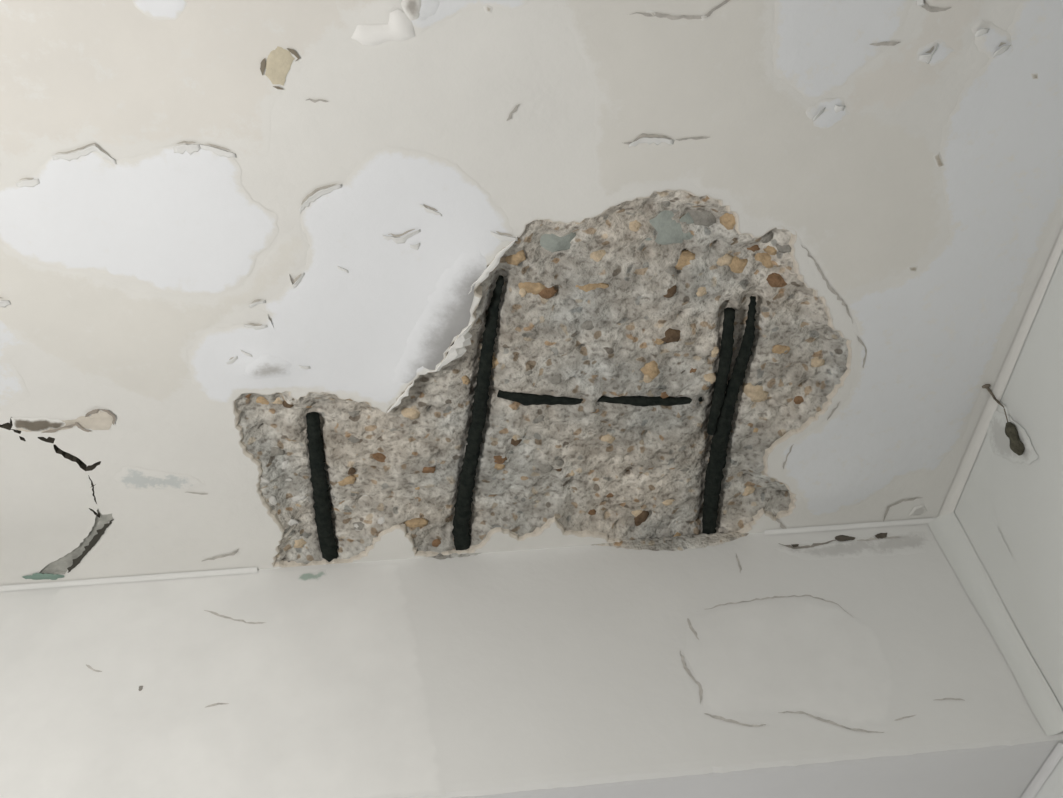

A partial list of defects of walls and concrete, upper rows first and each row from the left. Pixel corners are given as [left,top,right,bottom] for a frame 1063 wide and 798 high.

crack [633,0,730,21]
peeling [0,0,529,296]
spalling [188,0,1063,568]
peeling [11,409,116,433]
water stain [987,410,1039,465]
crack [0,417,101,518]
water stain [111,466,205,494]